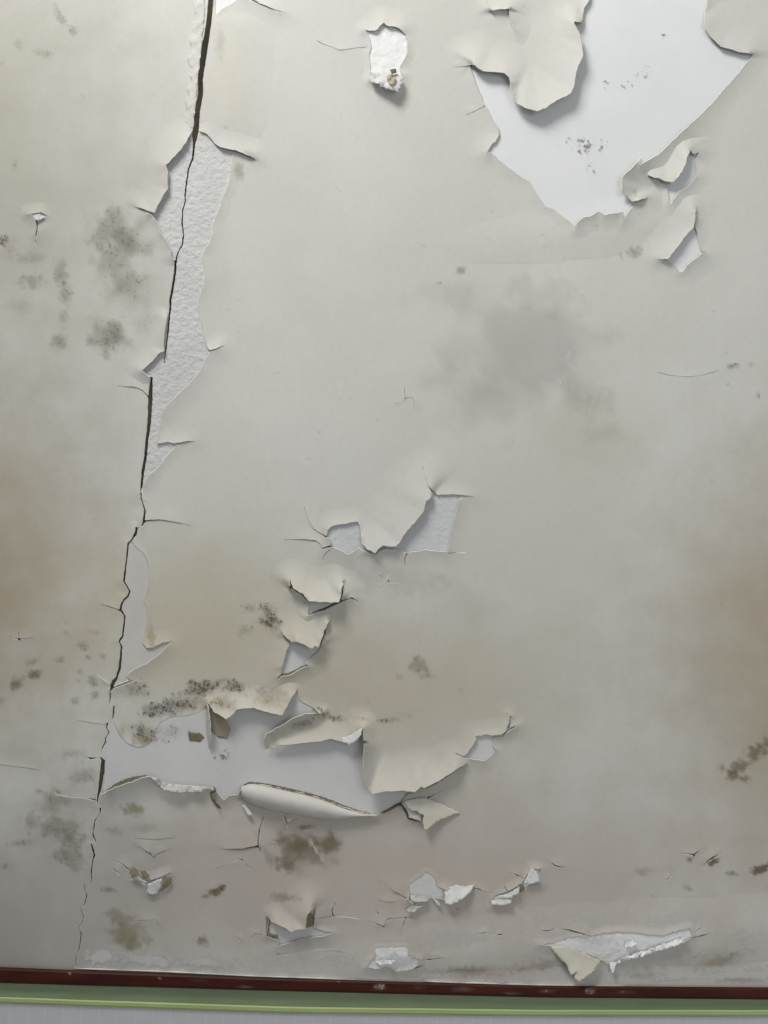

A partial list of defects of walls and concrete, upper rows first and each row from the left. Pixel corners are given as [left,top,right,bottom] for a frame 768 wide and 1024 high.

peeling [354,6,418,100]
peeling [443,0,768,285]
peeling [122,117,275,494]
crack [0,0,224,970]
peeling [99,447,534,839]
water stain [131,679,241,743]
peeling [125,864,178,902]
peeling [398,867,475,916]
peeling [484,860,550,914]
peeling [359,942,427,980]
peeling [531,921,698,984]